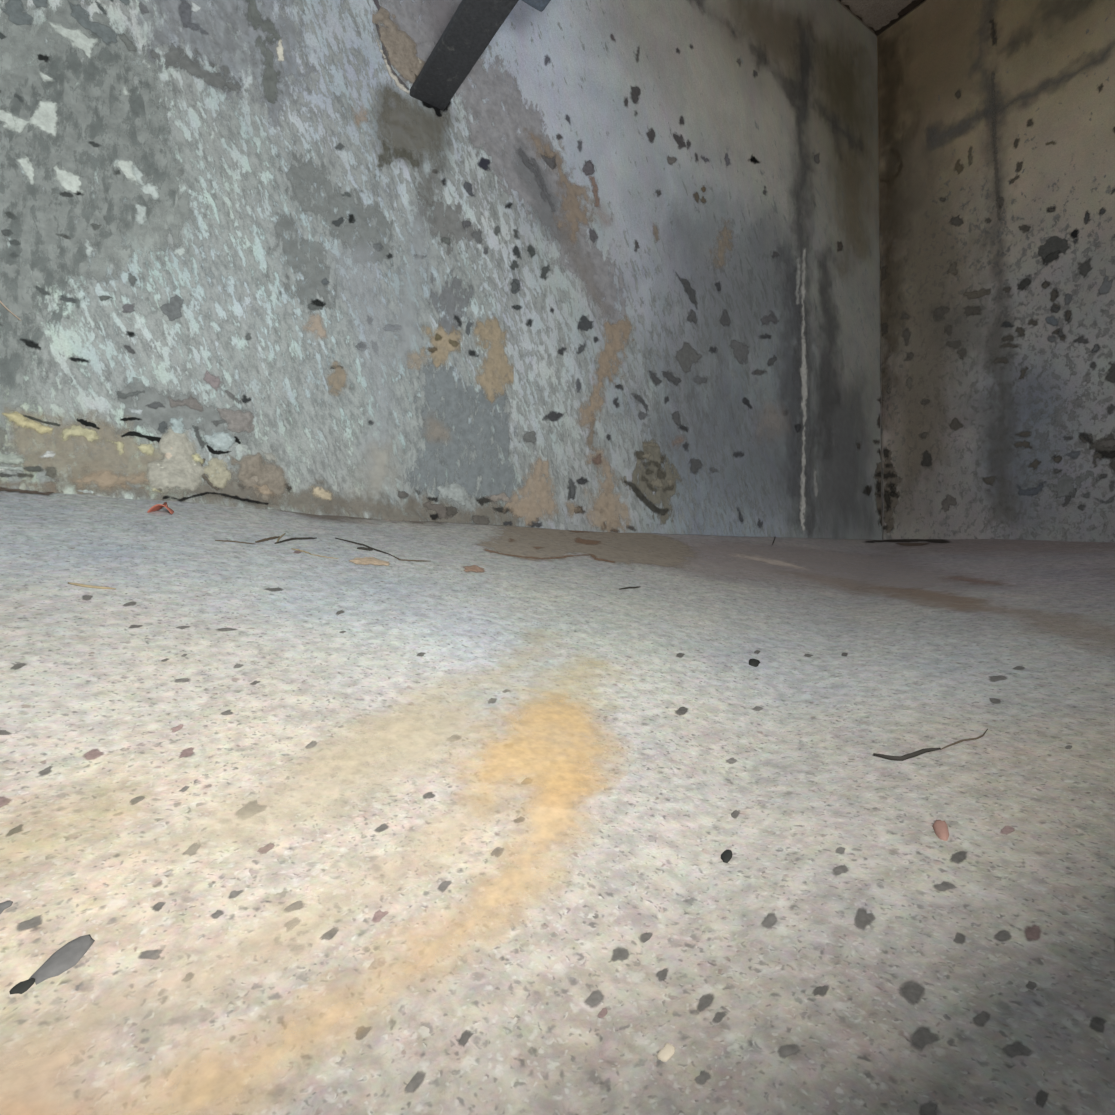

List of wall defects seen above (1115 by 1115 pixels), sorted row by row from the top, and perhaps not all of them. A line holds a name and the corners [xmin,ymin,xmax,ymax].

peeling [0,0,312,442]
spalling [114,371,255,455]
peeling [269,149,393,312]
peeling [418,182,488,255]
peeling [398,360,536,525]
spalling [478,157,490,170]
spalling [495,226,536,327]
spalling [558,316,598,355]
peeling [667,116,709,165]
leakage [748,6,863,530]
leakage [878,40,952,473]
leakage [928,48,1110,219]